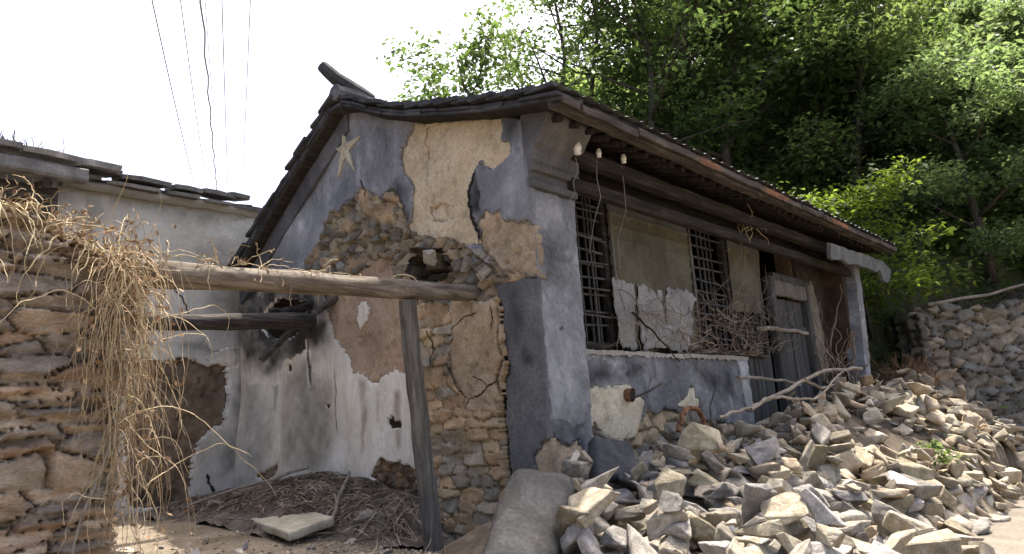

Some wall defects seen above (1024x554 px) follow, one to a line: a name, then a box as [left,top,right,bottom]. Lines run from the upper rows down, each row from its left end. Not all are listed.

flaking render [353,119,546,282]
flaking render [325,295,419,383]
flaking render [124,357,227,509]
spalling [371,457,419,497]
crack [426,303,512,475]
spalling [535,438,582,473]
flaking render [590,383,644,440]